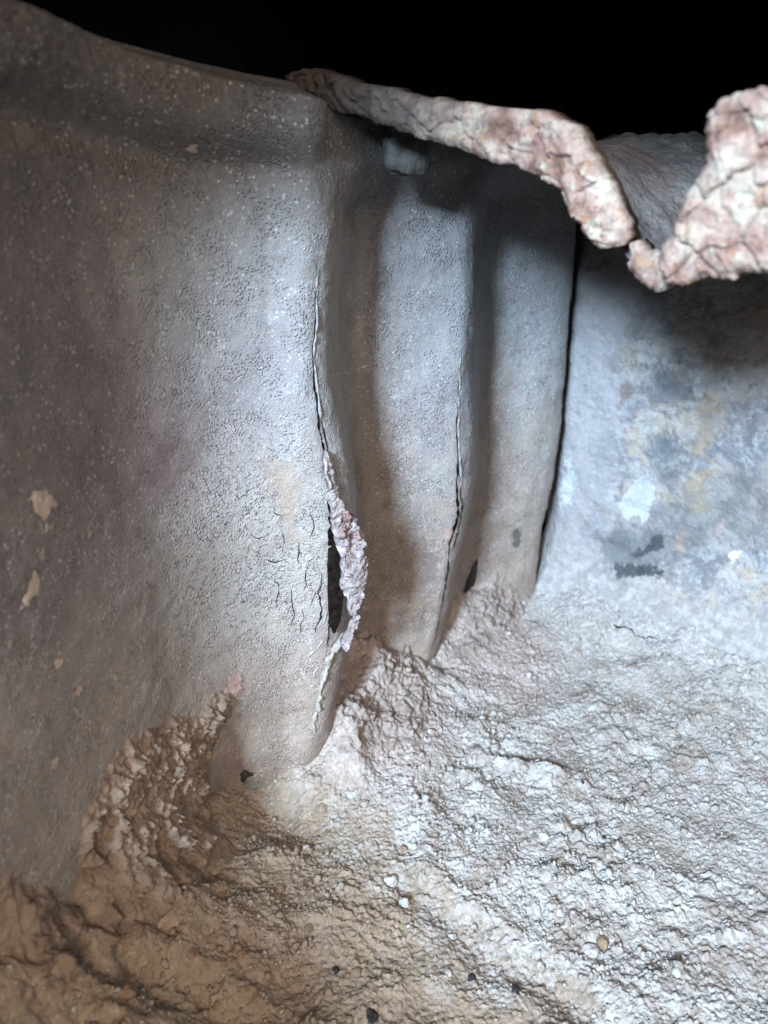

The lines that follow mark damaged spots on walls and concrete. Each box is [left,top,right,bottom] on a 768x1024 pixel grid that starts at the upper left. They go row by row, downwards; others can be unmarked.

spalling [285,68,640,249]
crack [312,261,328,469]
crack [435,354,463,637]
leakage [644,433,681,490]
spalling [304,508,361,737]